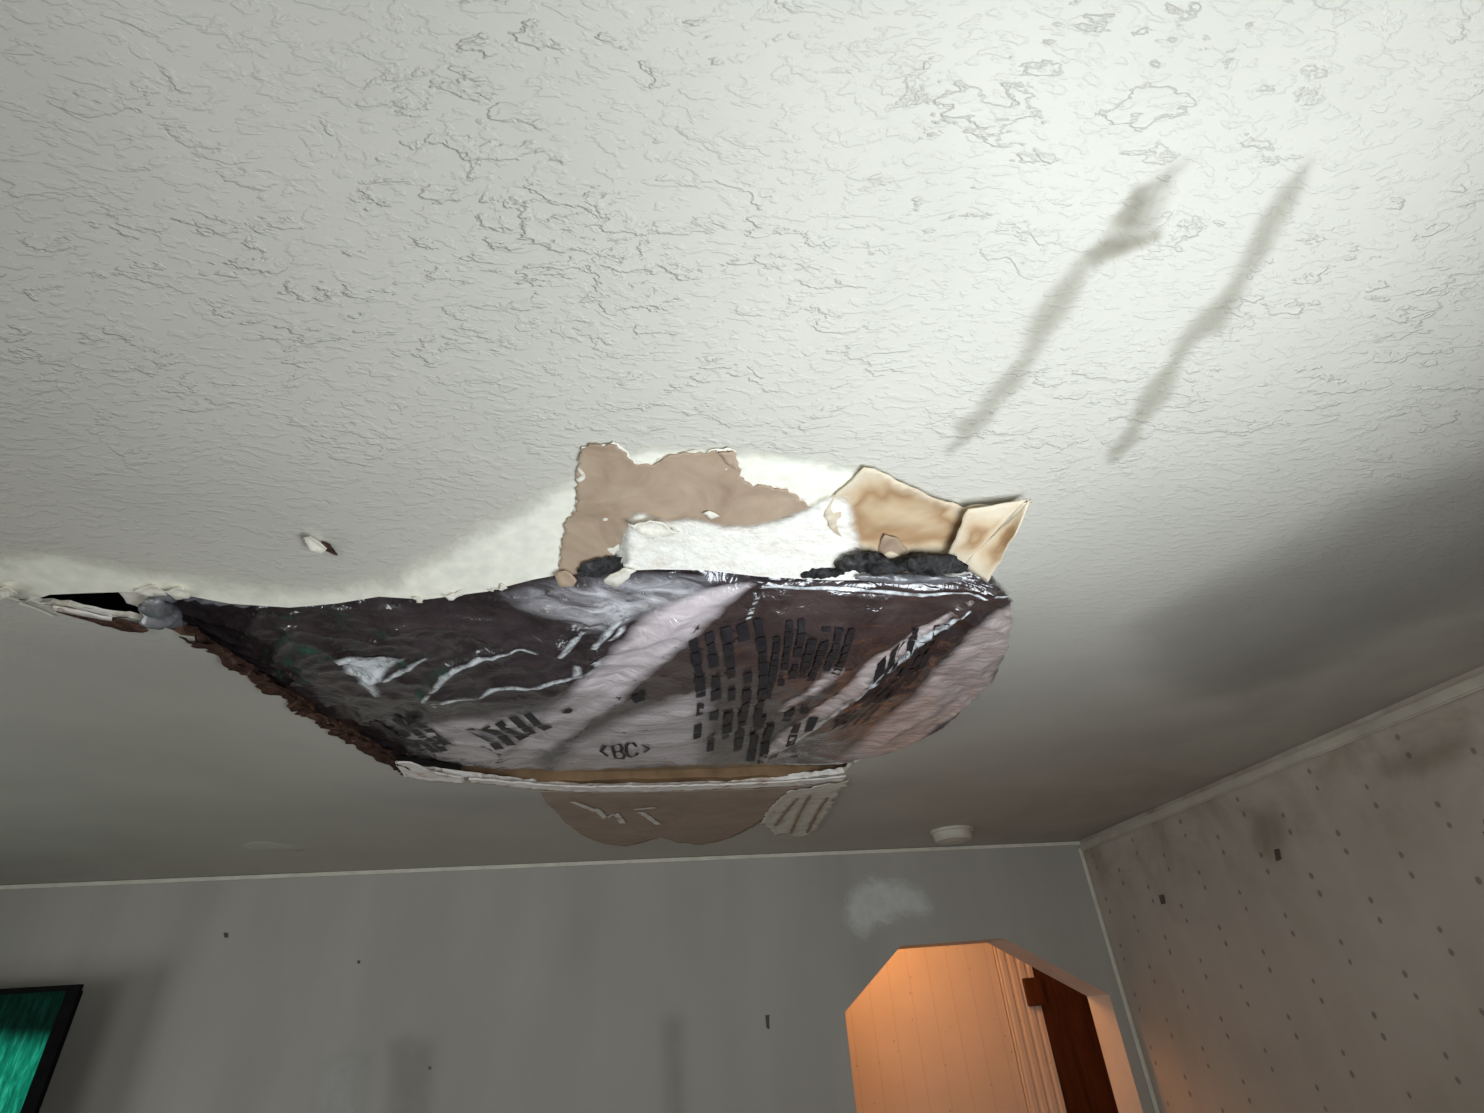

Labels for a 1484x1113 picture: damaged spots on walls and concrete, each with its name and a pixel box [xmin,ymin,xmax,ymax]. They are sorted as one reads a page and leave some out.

peeling [629,449,708,463]
peeling [736,453,859,507]
peeling [628,520,679,539]
peeling [0,478,578,620]
peeling [604,567,636,586]
spalling [395,759,861,786]